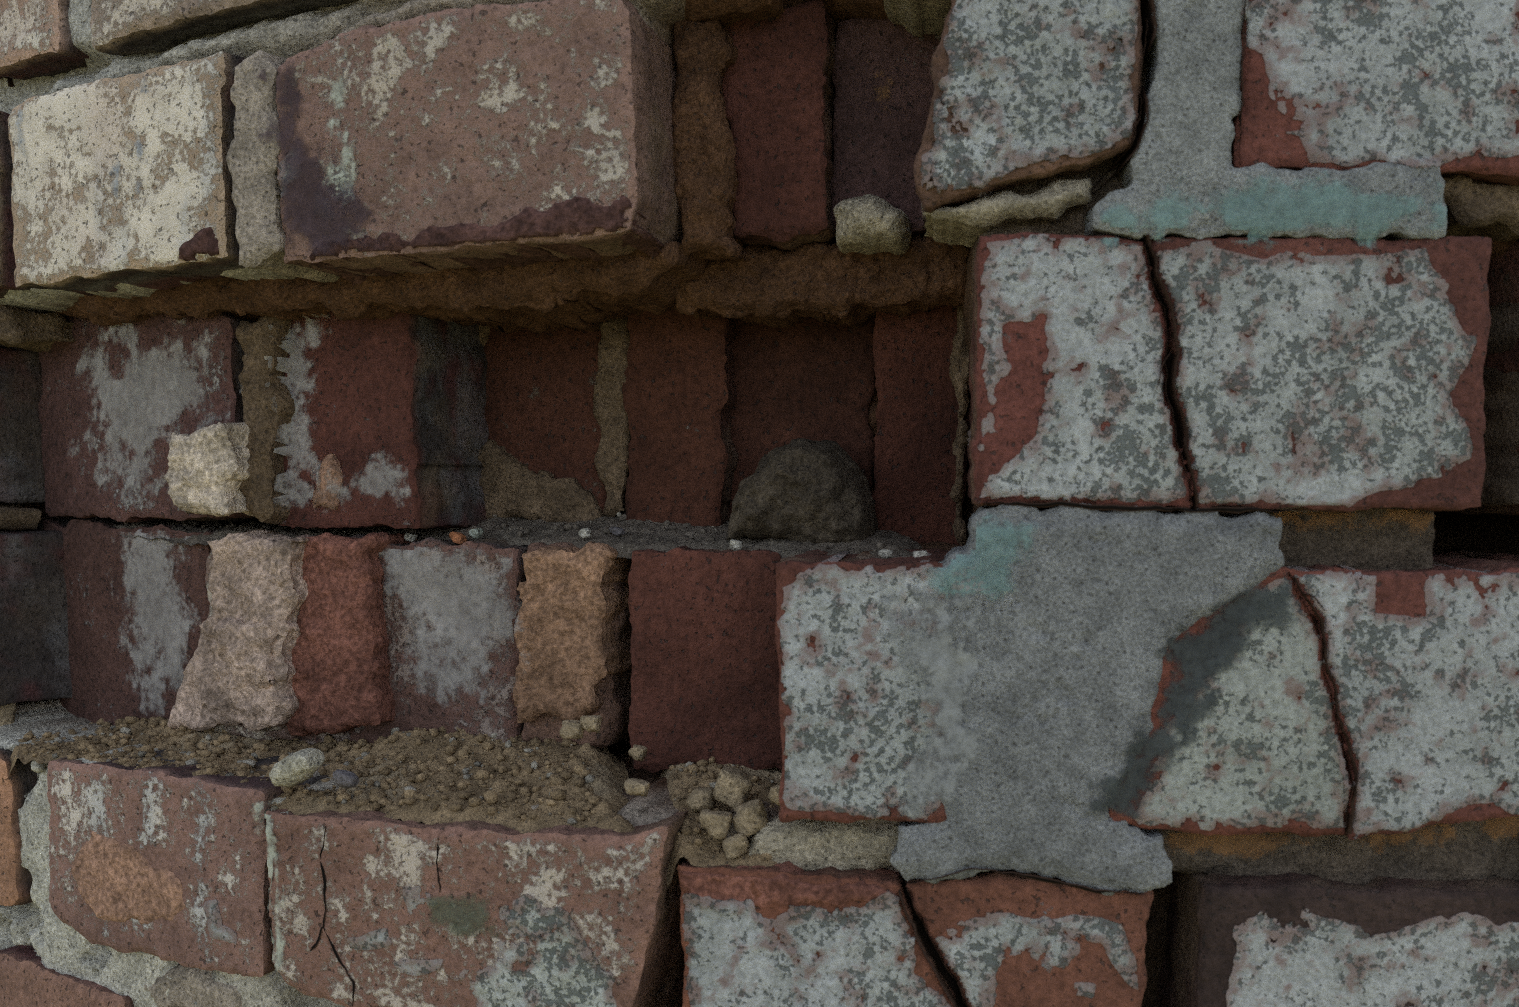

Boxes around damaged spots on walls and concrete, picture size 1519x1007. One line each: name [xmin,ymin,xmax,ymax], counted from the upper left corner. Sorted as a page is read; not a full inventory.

peeling [920,0,1138,230]
peeling [1241,0,1519,168]
crack [982,234,1286,513]
peeling [967,234,1477,514]
spalling [163,422,418,737]
spalling [513,541,632,724]
crack [1289,572,1358,835]
crack [310,826,355,1007]
peeling [679,861,1138,1007]
crack [898,868,1146,1007]
peeling [1226,908,1519,1007]